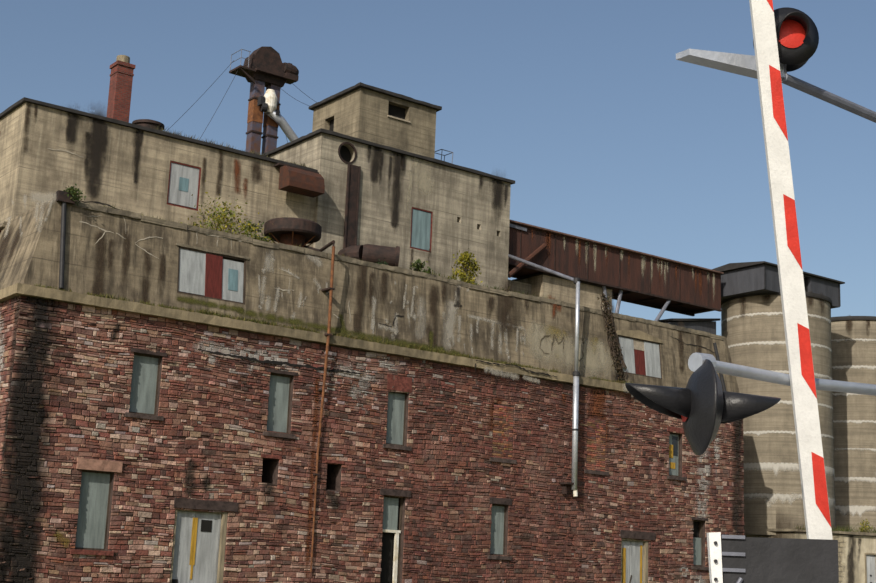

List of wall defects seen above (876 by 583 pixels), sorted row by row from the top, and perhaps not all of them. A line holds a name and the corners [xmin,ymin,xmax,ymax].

water stain [68,111,107,196]
water stain [134,129,143,183]
water stain [368,145,431,227]
water stain [348,265,620,381]
water stain [0,296,56,583]
corrosion [305,379,320,564]